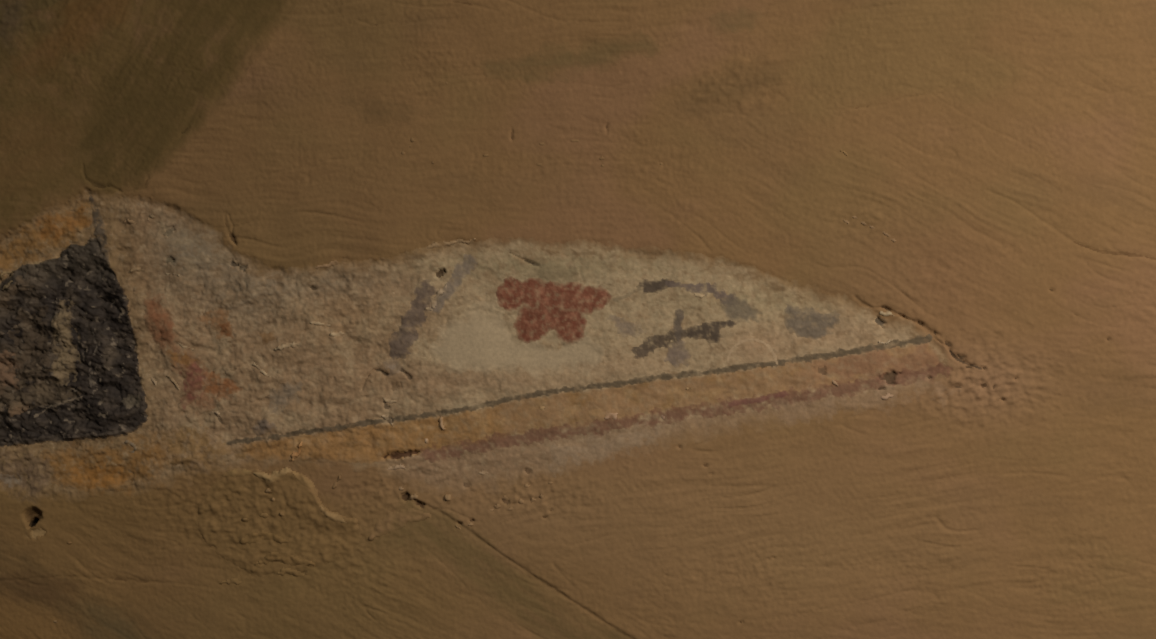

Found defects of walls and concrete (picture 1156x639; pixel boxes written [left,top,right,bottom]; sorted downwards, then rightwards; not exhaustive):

peeling [0,272,98,417]
spalling [878,370,898,400]
spalling [383,438,429,470]